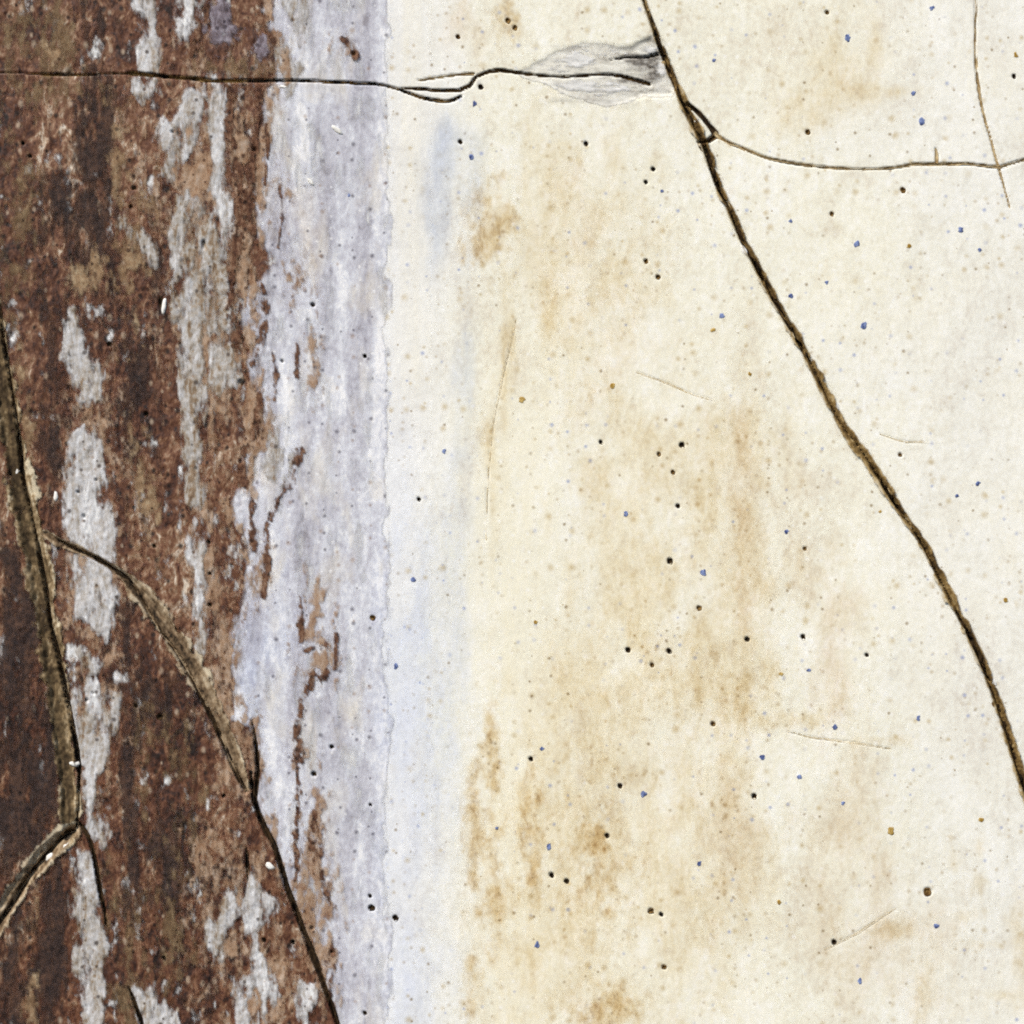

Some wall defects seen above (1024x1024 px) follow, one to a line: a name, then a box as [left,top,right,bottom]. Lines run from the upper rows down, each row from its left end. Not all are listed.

corrosion [328,36,360,60]
spalling [519,36,674,107]
crack [0,0,1024,802]
corrosion [0,0,343,1024]
crack [0,302,340,1024]
peeling [205,875,281,1024]
peeling [294,980,318,1024]